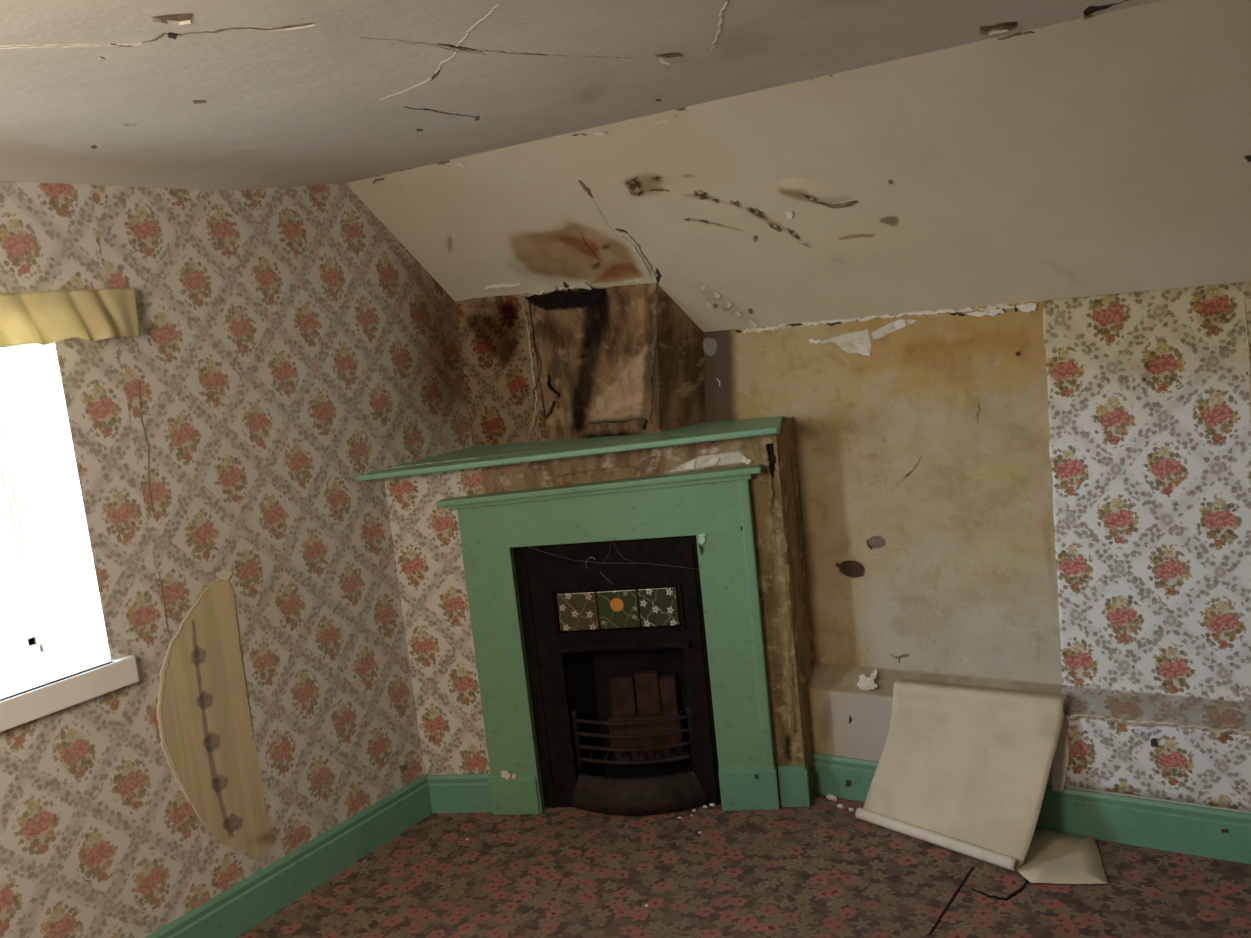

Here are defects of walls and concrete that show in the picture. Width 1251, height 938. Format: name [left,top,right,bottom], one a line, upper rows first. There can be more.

crack [0,23,316,50]
crack [360,5,634,121]
flaking render [979,22,1018,36]
peeling [701,283,1037,356]
peeling [157,579,273,857]